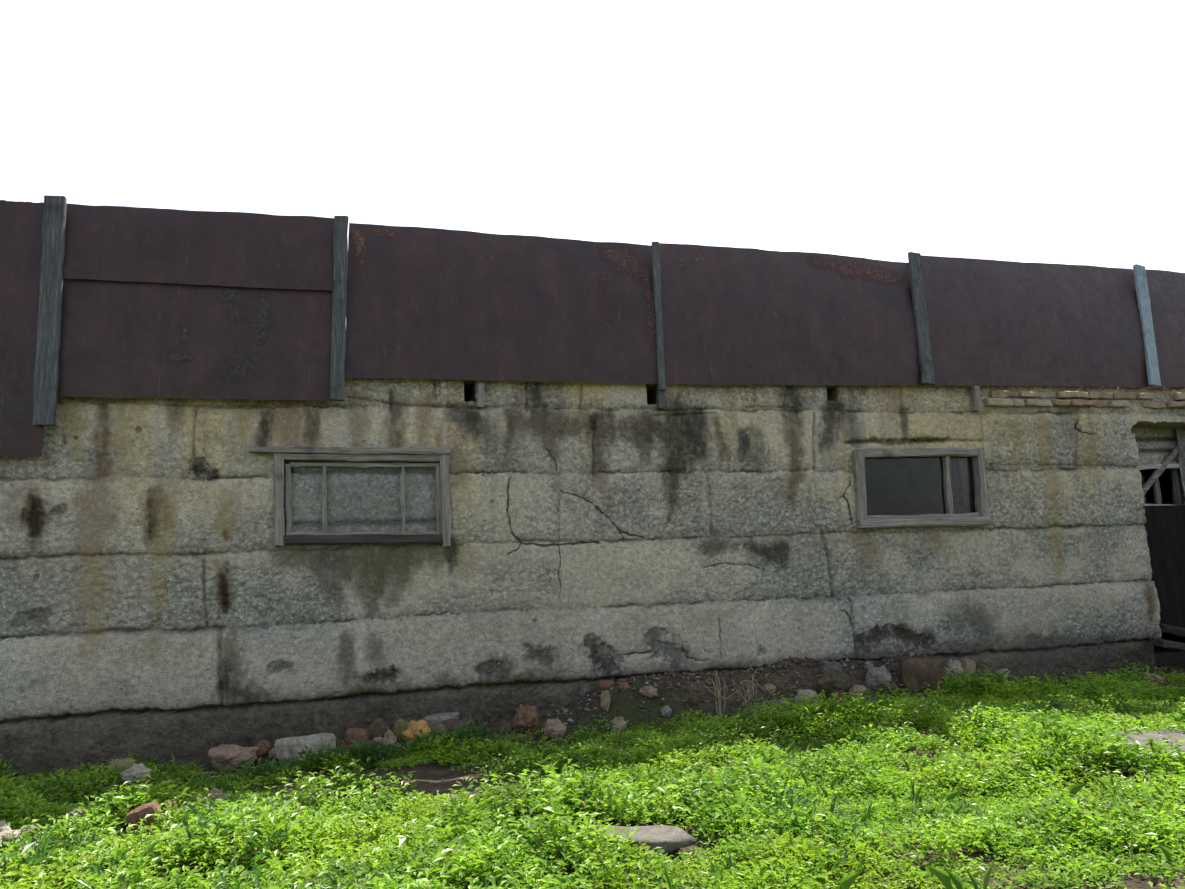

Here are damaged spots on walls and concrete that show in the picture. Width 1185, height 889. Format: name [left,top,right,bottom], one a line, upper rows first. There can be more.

damp [505,382,707,507]
crack [506,447,655,595]
damp [339,634,394,693]